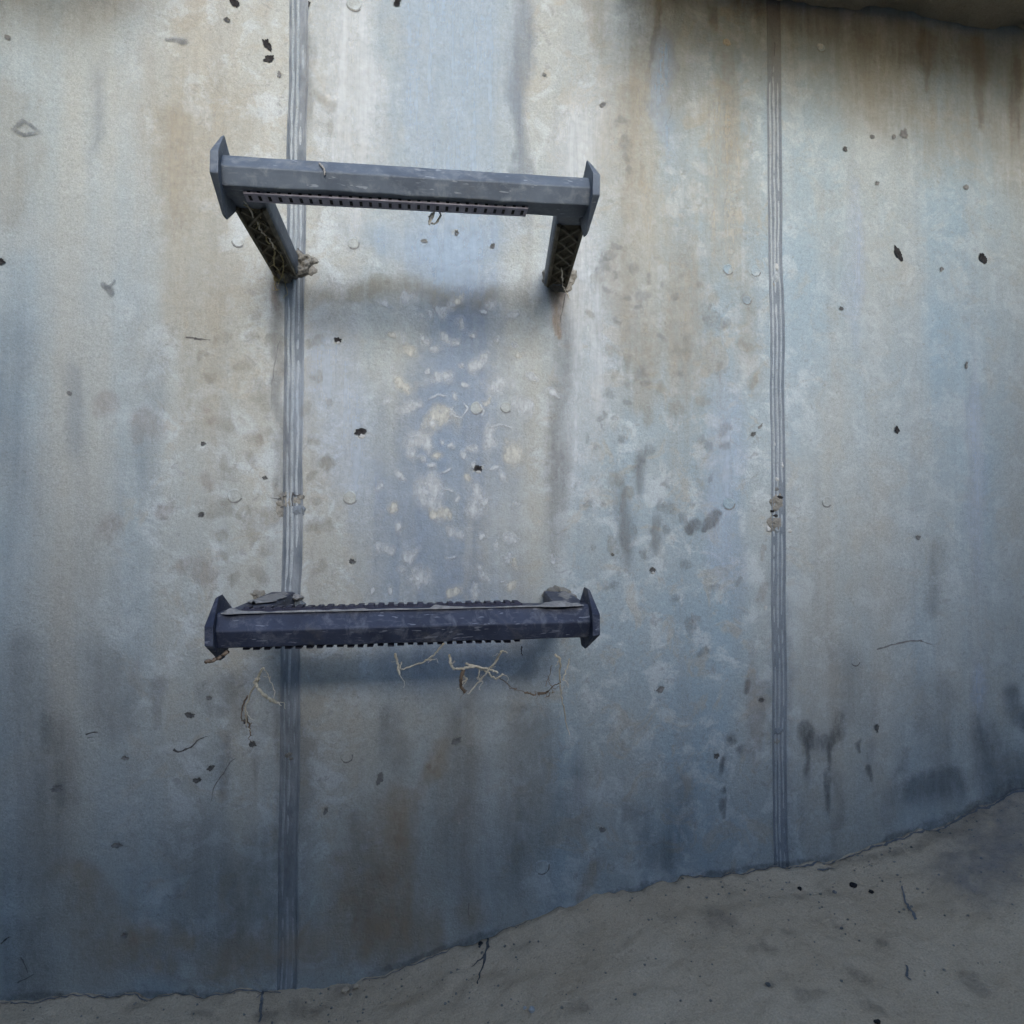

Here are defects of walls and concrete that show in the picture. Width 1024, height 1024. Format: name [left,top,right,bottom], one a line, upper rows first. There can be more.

leakage [395,353,521,539]